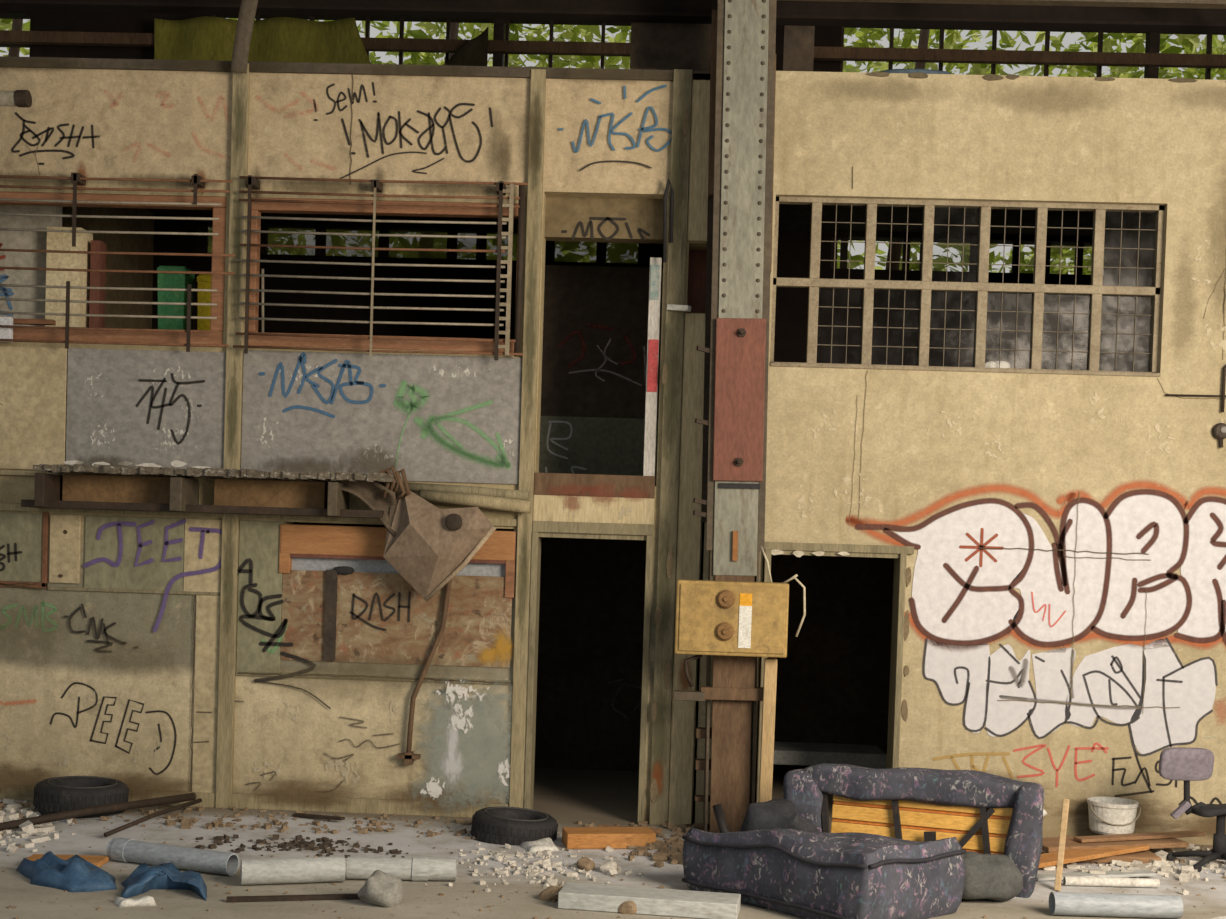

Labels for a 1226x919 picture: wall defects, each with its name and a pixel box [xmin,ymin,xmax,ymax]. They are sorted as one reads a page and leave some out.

peeling [419,680,512,805]
water stain [0,767,49,789]
water stain [263,781,340,803]
water stain [402,787,481,810]